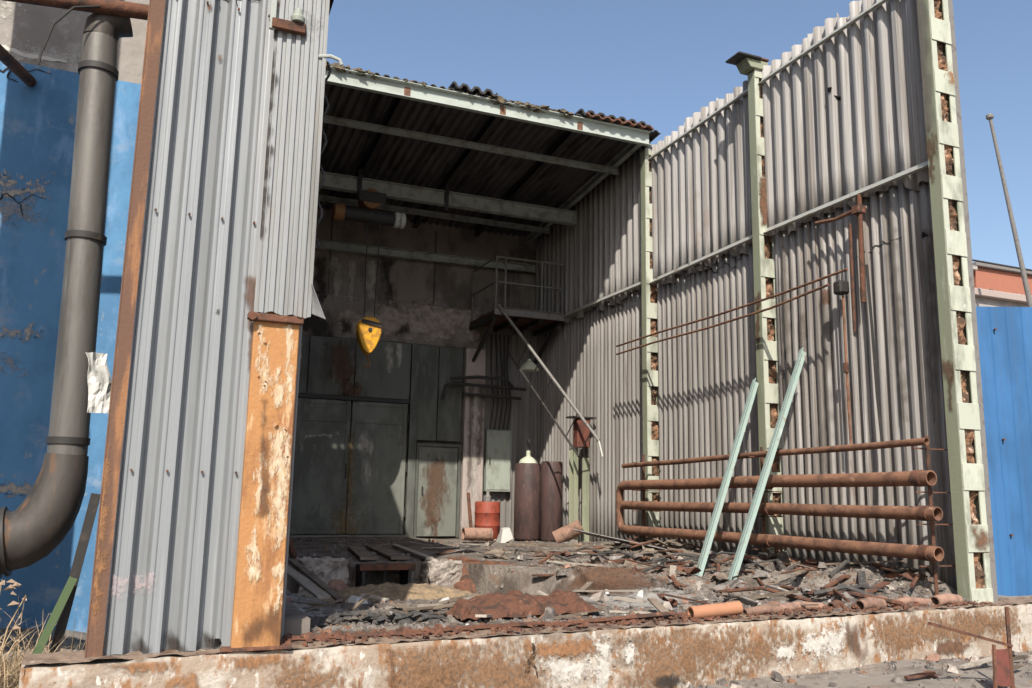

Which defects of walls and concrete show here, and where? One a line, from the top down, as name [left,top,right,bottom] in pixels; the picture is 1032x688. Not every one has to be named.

crack [0,193,45,216]
peeling [0,168,50,225]
leakage [300,256,394,360]
peeling [255,325,294,408]
corrosion [92,458,110,614]
peeling [245,425,291,610]
corrosion [422,460,447,536]
corrosion [381,638,596,688]
corrosion [619,625,805,688]
corrosion [847,608,1021,659]